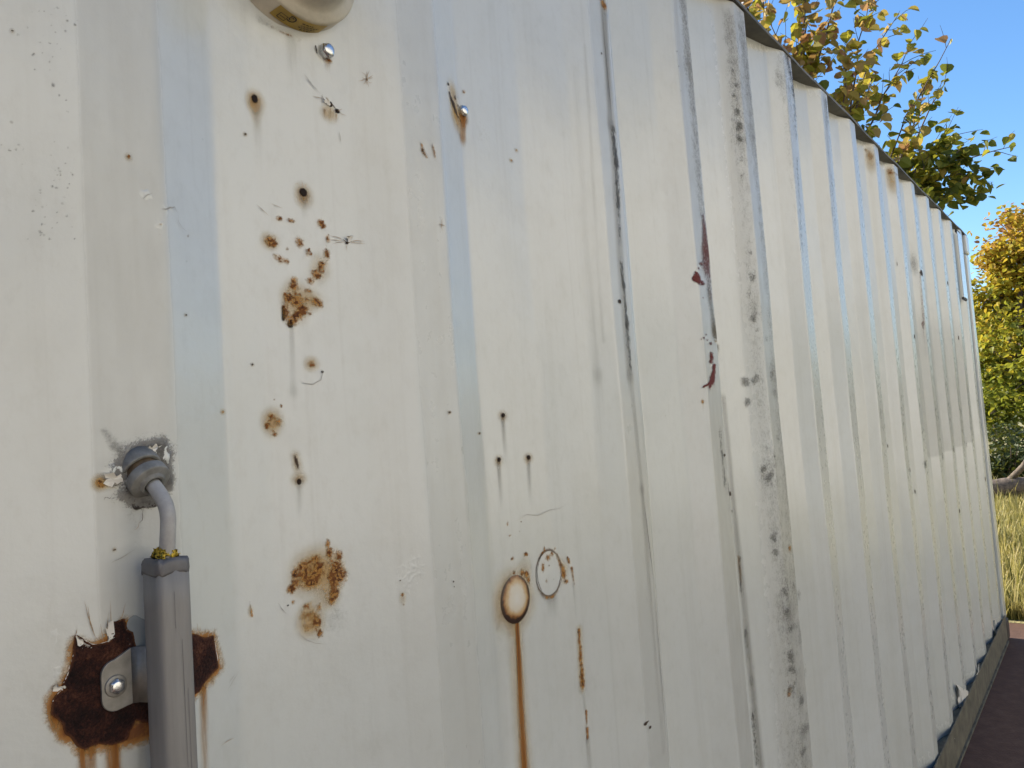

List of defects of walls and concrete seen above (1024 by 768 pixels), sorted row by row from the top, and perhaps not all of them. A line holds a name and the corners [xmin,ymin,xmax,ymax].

corrosion [448,83,467,141]
corrosion [265,220,330,328]
peeling [692,216,720,390]
corrosion [265,405,282,436]
peeling [103,473,123,487]
corrosion [278,540,346,644]
corrosion [542,547,574,583]
corrosion [515,623,527,768]